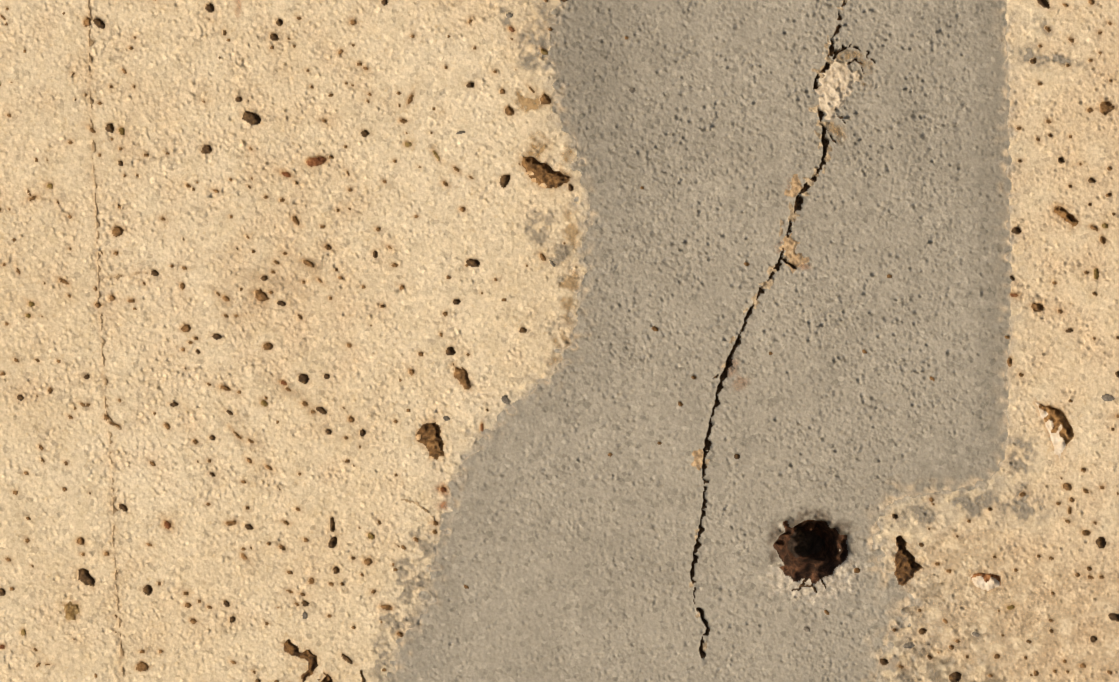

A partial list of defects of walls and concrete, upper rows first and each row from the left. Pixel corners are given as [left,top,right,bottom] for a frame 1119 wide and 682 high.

crack [689,0,876,658]
spalling [814,52,863,120]